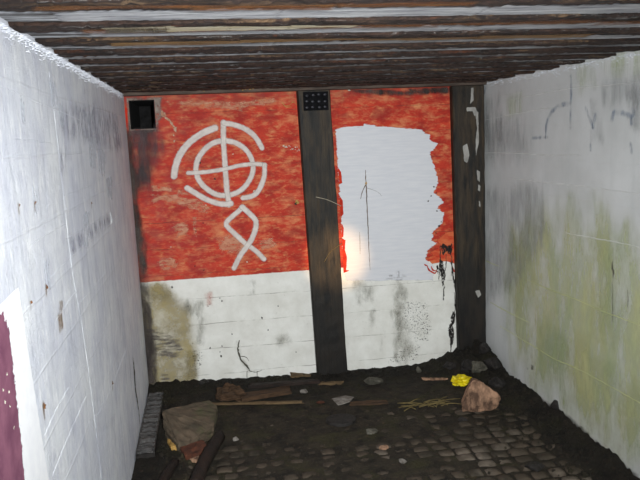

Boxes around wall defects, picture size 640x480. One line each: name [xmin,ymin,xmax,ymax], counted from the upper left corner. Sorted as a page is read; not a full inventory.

water stain [133,205,146,266]
water stain [141,284,202,385]
crack [237,340,259,372]